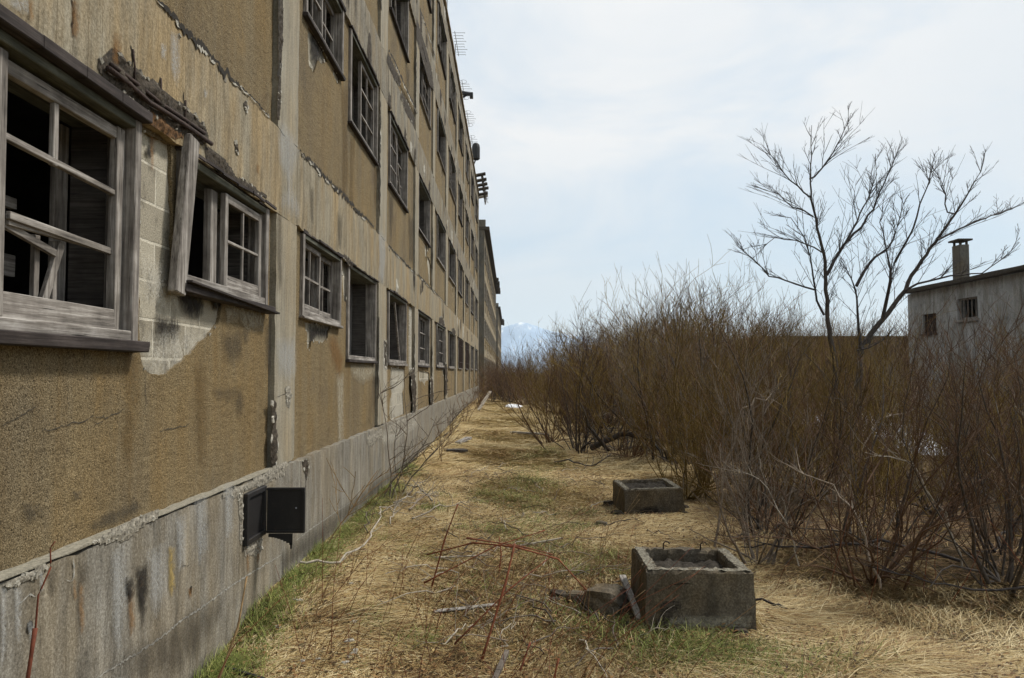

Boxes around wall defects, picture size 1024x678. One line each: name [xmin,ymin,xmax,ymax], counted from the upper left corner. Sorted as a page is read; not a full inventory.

spalling [98,47,267,375]
crack [3,377,147,431]
spalling [223,386,292,557]
spalling [92,509,159,545]
damp [126,566,148,618]